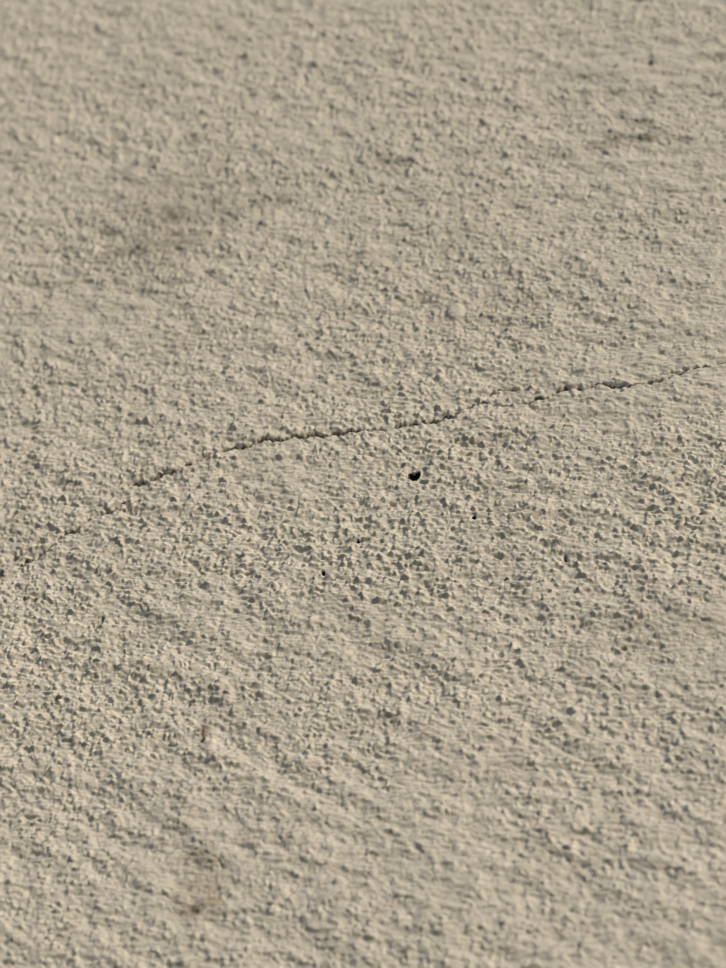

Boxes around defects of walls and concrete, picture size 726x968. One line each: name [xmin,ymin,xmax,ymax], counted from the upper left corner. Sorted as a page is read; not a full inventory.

crack [18,362,726,569]